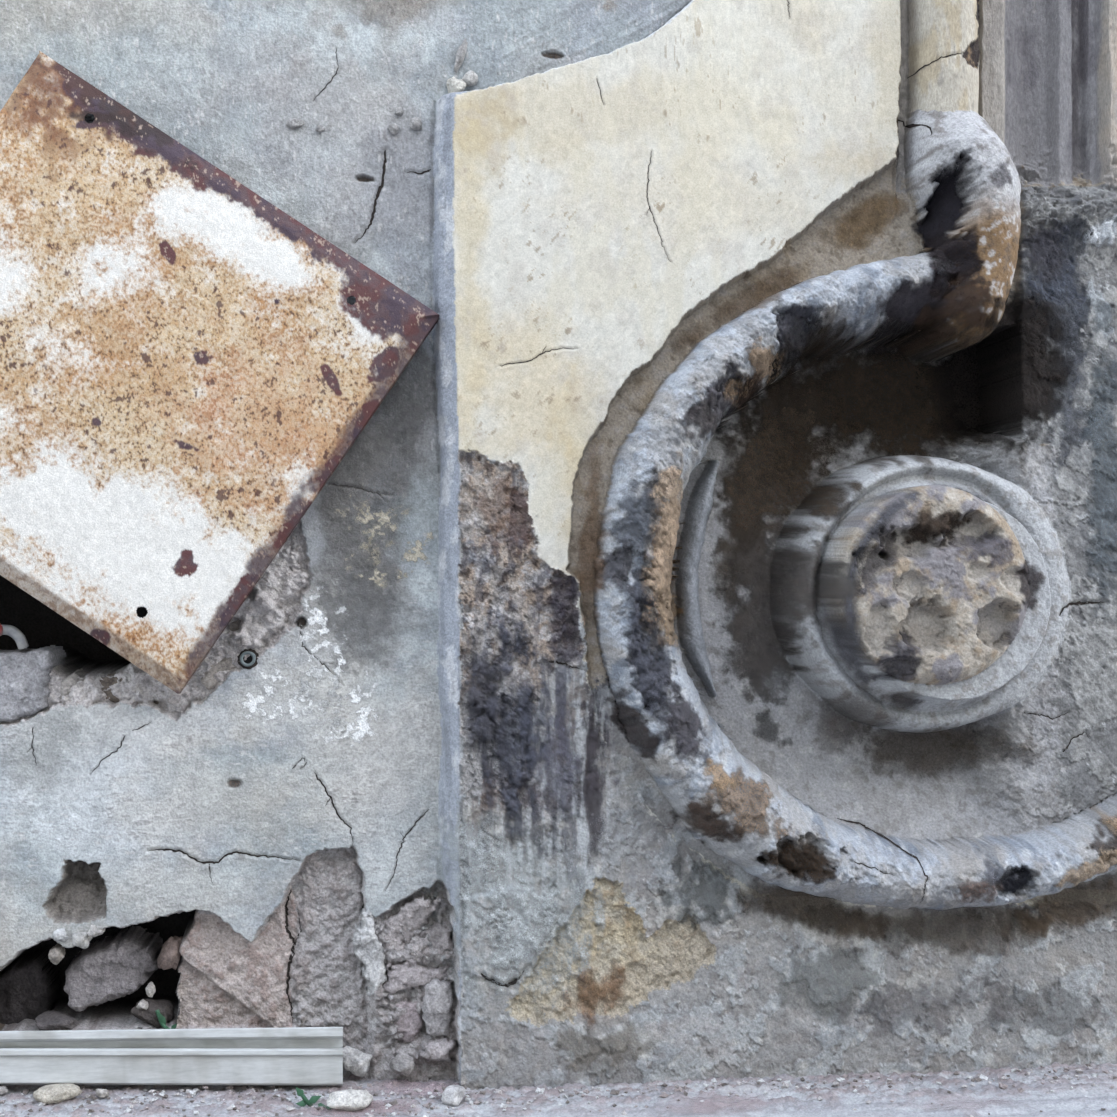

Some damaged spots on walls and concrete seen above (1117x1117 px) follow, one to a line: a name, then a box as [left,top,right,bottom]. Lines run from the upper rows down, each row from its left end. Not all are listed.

peeling [963,0,980,70]
spalling [0,520,378,746]
peeling [459,450,587,819]
crack [149,849,299,883]
crack [385,809,429,891]
damp [437,623,604,985]
spalling [0,846,465,1111]
crack [285,890,301,1023]
spalling [505,877,717,1028]